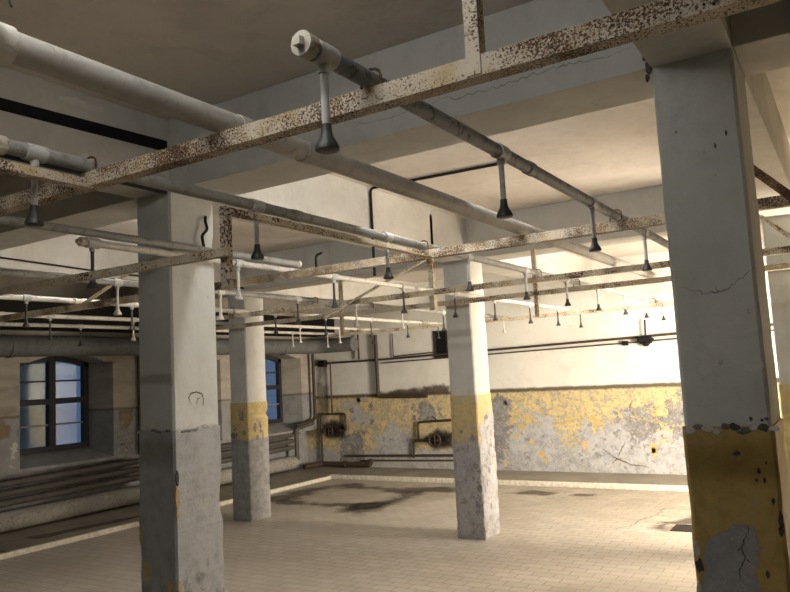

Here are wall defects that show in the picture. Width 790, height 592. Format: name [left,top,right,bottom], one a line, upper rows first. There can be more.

peeling [231,411,264,440]
peeling [339,396,444,467]
peeling [453,389,780,540]
peeling [771,498,784,537]
peeling [692,524,770,592]
crack [738,527,751,580]